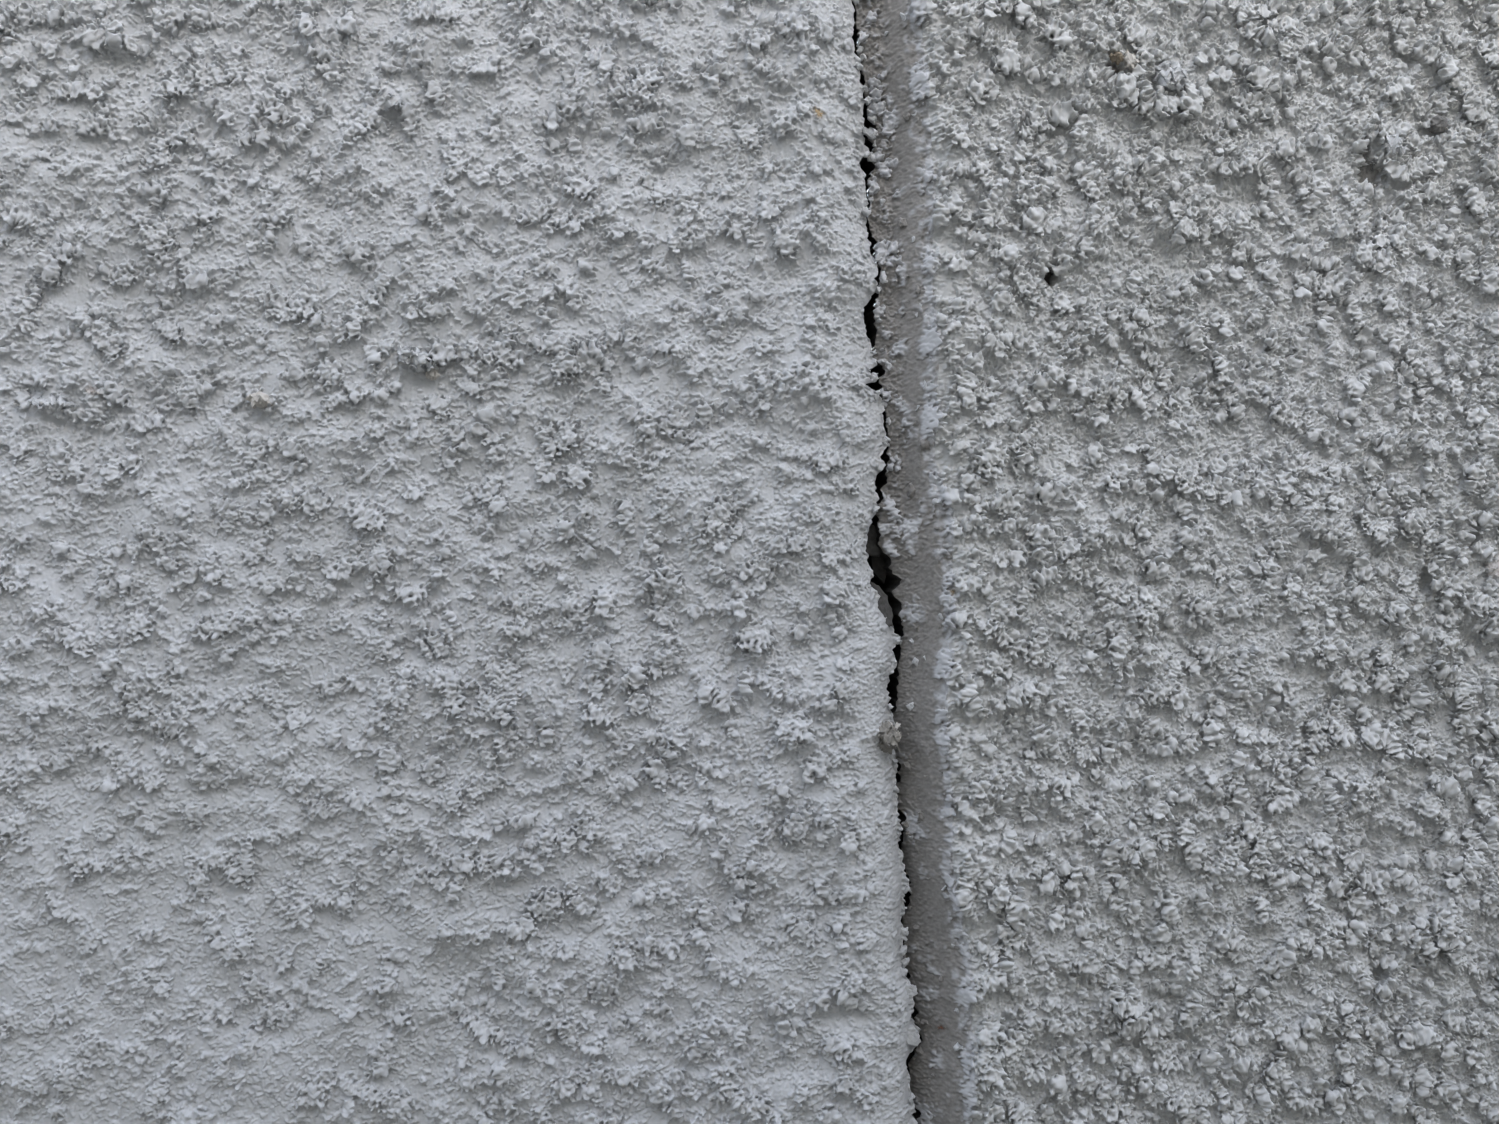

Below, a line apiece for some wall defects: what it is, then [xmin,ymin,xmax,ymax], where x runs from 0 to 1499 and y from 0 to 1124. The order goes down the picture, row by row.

crack [851,0,904,713]
crack [892,759,924,1120]